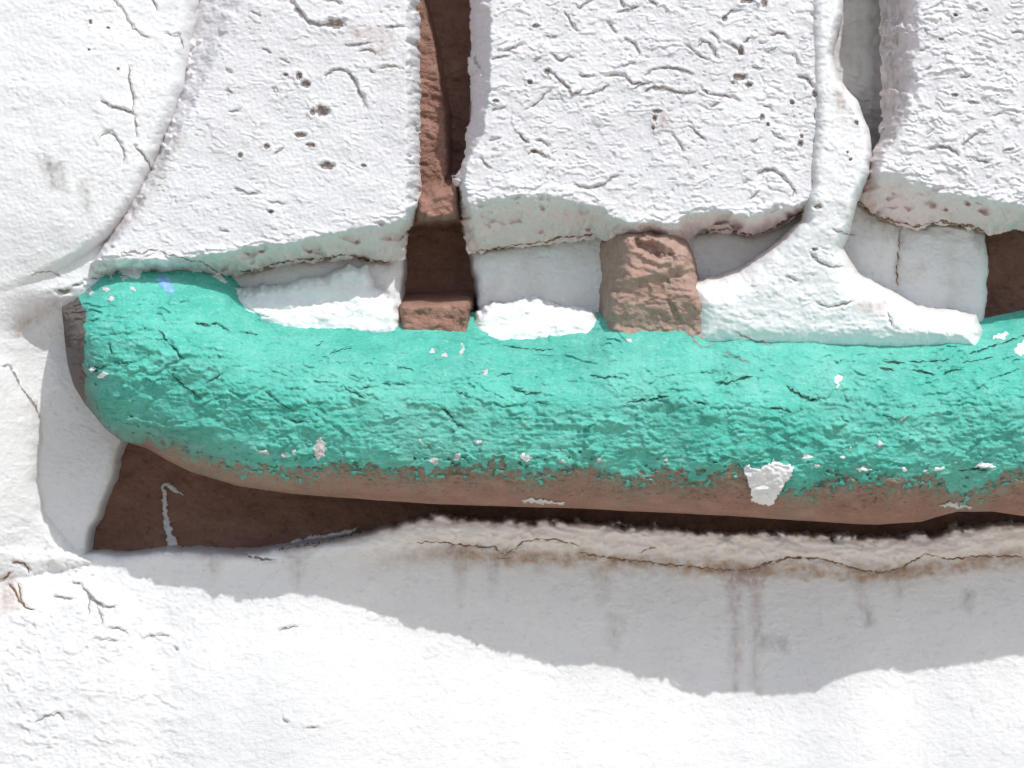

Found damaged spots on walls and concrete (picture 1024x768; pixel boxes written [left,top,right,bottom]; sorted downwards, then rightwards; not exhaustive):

crack [480,0,812,167]
crack [99,67,152,171]
crack [575,174,621,189]
crack [159,330,222,398]
crack [196,322,258,335]
crack [667,278,772,405]
crack [879,335,1024,375]
crack [770,386,817,413]
peeling [743,454,820,506]
flaking render [161,482,183,555]
crack [417,538,1022,574]
crack [1,561,178,650]